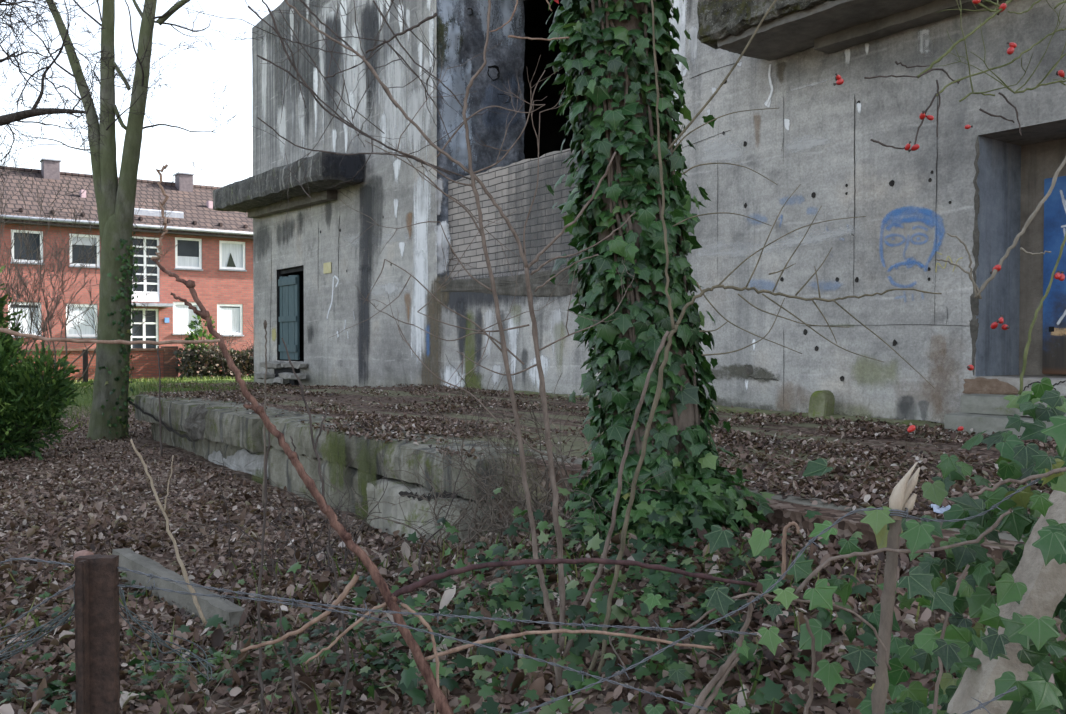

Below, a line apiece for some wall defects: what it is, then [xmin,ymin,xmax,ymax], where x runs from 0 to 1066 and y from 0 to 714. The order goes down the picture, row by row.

damp [255,0,580,388]
crack [399,478,458,502]